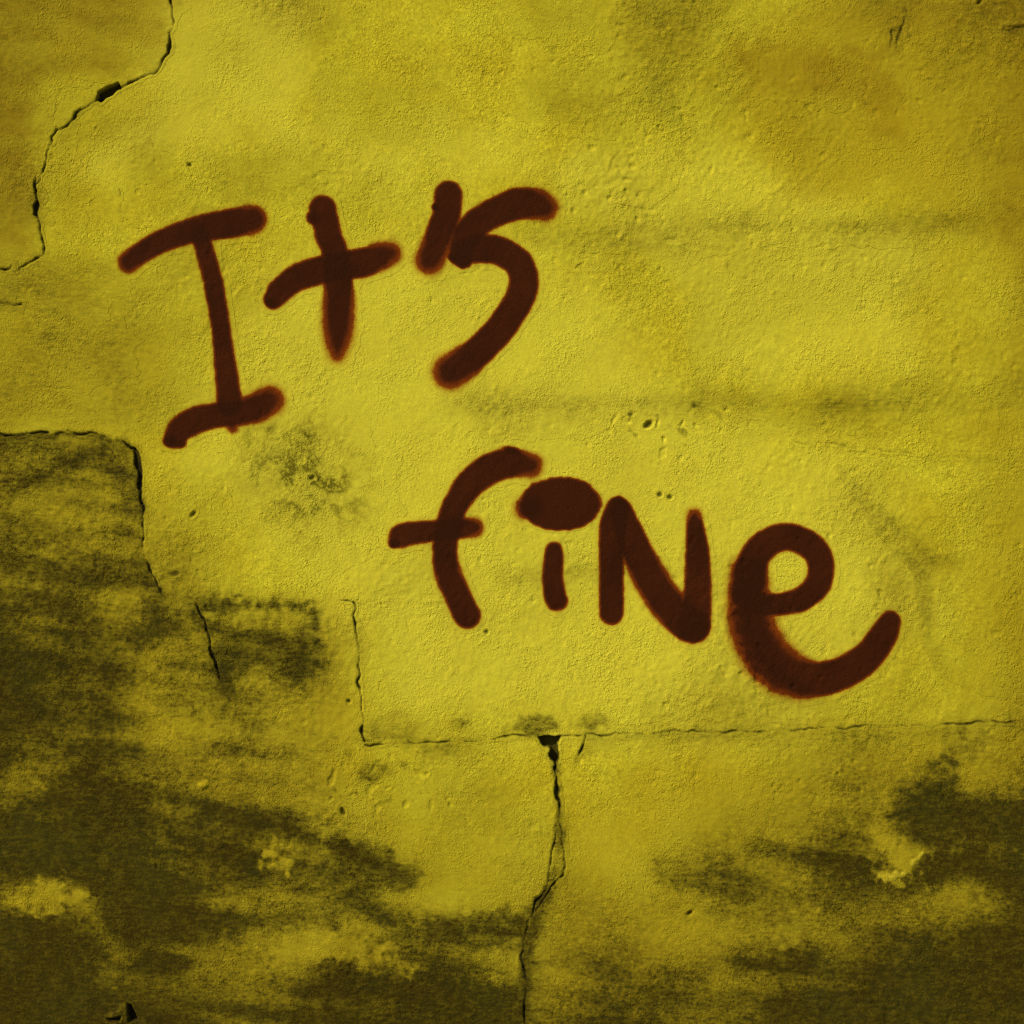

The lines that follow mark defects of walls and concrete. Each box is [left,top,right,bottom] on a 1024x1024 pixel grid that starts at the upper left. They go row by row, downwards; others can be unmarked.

crack [0,0,178,275]
crack [0,300,25,310]
crack [0,427,224,685]
leakage [0,405,576,1024]
crack [337,596,1017,1024]
leakage [498,706,1024,1024]